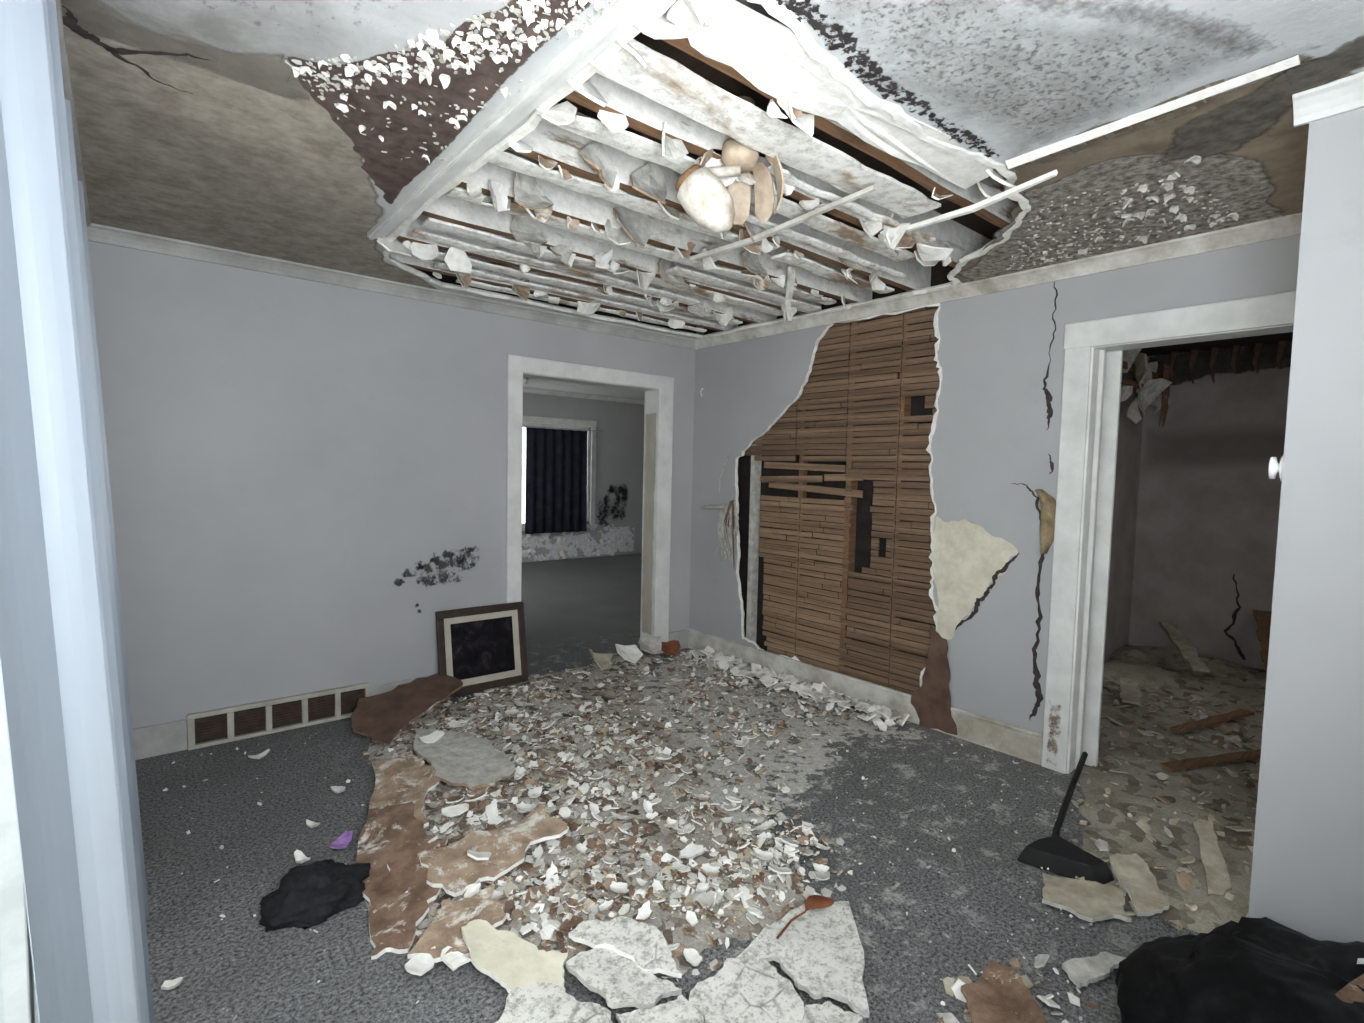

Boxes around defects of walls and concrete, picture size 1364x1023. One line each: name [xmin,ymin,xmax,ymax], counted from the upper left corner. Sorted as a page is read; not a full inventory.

crack [62,5,209,94]
leakage [61,0,436,289]
peeling [377,237,472,279]
peeling [285,0,629,204]
peeling [634,0,711,39]
peeling [662,121,756,187]
peeling [766,95,814,137]
peeling [841,217,953,291]
peeling [958,154,1284,282]
crack [1013,282,1058,520]
spalling [735,296,1019,735]
crack [1029,554,1045,721]